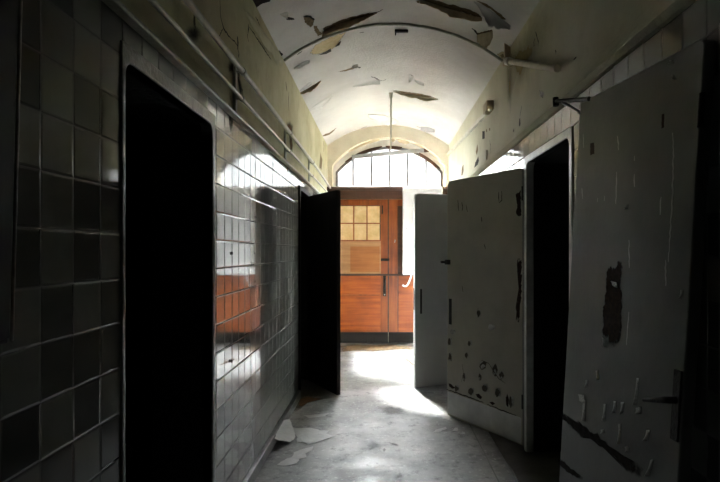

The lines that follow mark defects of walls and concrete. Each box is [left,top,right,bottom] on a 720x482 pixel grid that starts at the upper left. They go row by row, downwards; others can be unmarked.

crack [219,12,260,91]
peeling [294,9,383,69]
peeling [417,0,511,49]
peeling [300,81,321,94]
peeling [393,74,438,101]